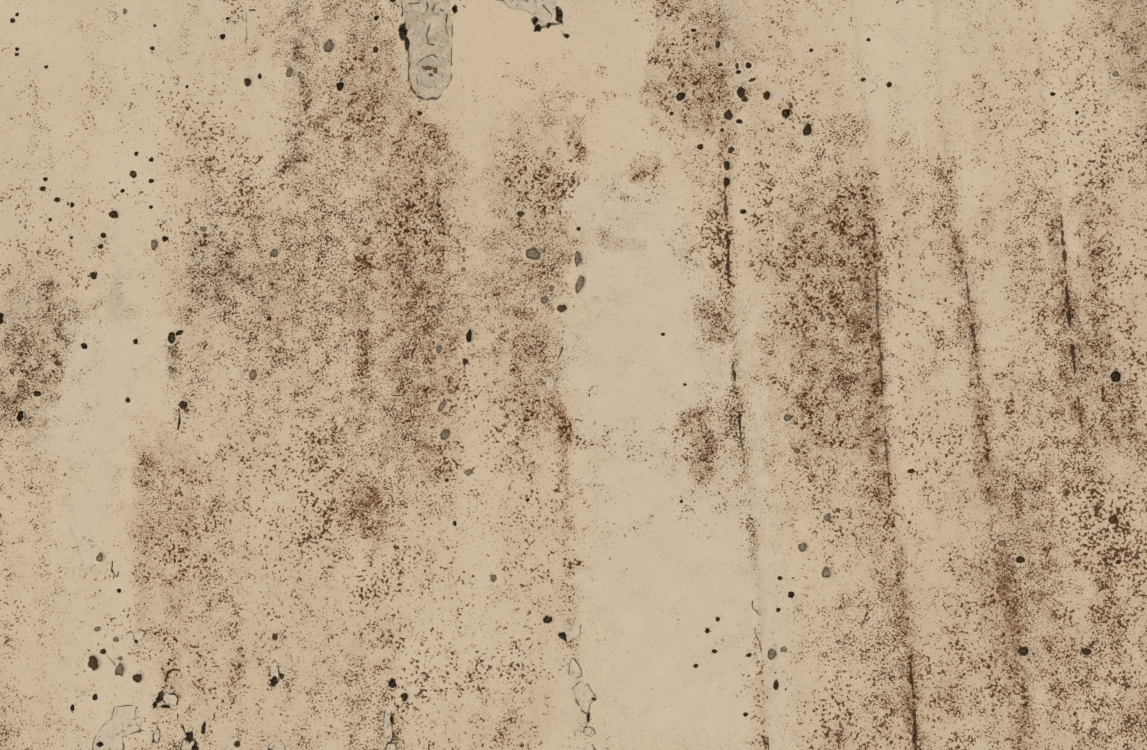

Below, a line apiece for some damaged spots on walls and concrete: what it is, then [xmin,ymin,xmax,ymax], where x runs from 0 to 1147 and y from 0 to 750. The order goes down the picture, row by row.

spalling [390,0,457,116]
spalling [502,0,570,38]
damp [641,0,764,159]
damp [176,212,295,328]
damp [273,0,576,493]
damp [1044,191,1146,447]
damp [694,169,902,750]
damp [947,215,1078,750]
peeling [542,610,581,644]
peeling [153,690,179,708]
peeling [176,721,206,750]
peeling [383,678,408,750]